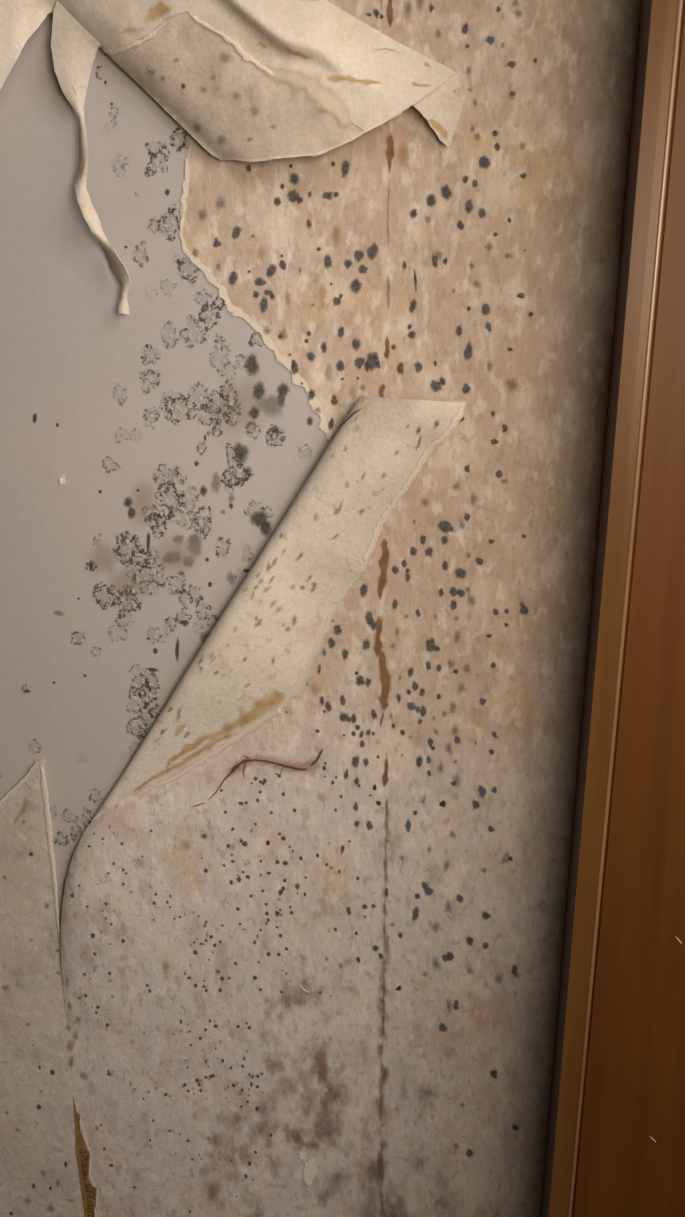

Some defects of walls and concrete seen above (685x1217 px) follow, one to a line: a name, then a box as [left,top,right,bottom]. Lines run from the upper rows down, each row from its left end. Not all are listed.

leakage [145,127,190,177]
leakage [479,130,500,168]
leakage [274,164,339,205]
leakage [410,185,451,218]
leakage [457,176,485,230]
leakage [214,227,254,247]
leakage [317,244,378,305]
leakage [403,261,417,338]
leakage [336,327,445,391]
leakage [456,327,472,359]
leakage [78,254,326,659]
peeling [73,1098,97,1217]